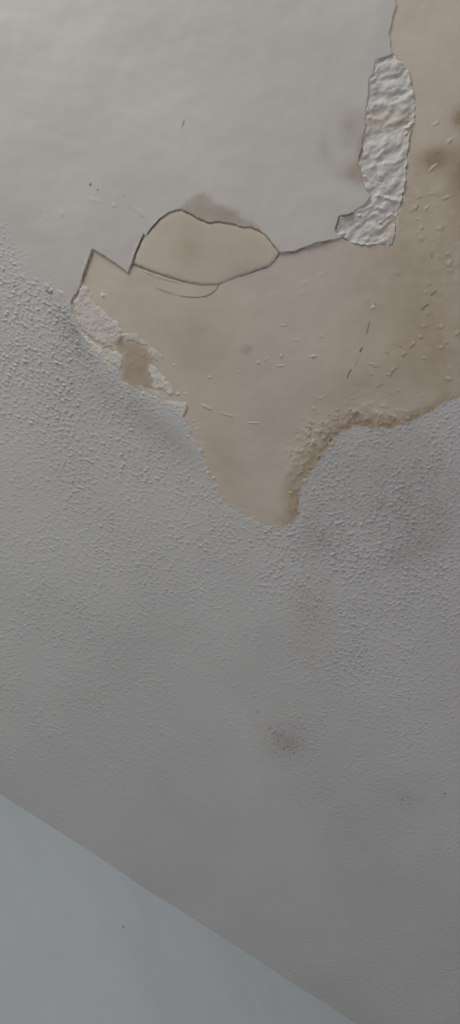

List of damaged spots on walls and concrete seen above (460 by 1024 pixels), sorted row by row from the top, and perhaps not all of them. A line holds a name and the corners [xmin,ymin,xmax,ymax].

crack [70,247,93,303]
crack [127,209,334,298]
peeling [10,0,460,530]